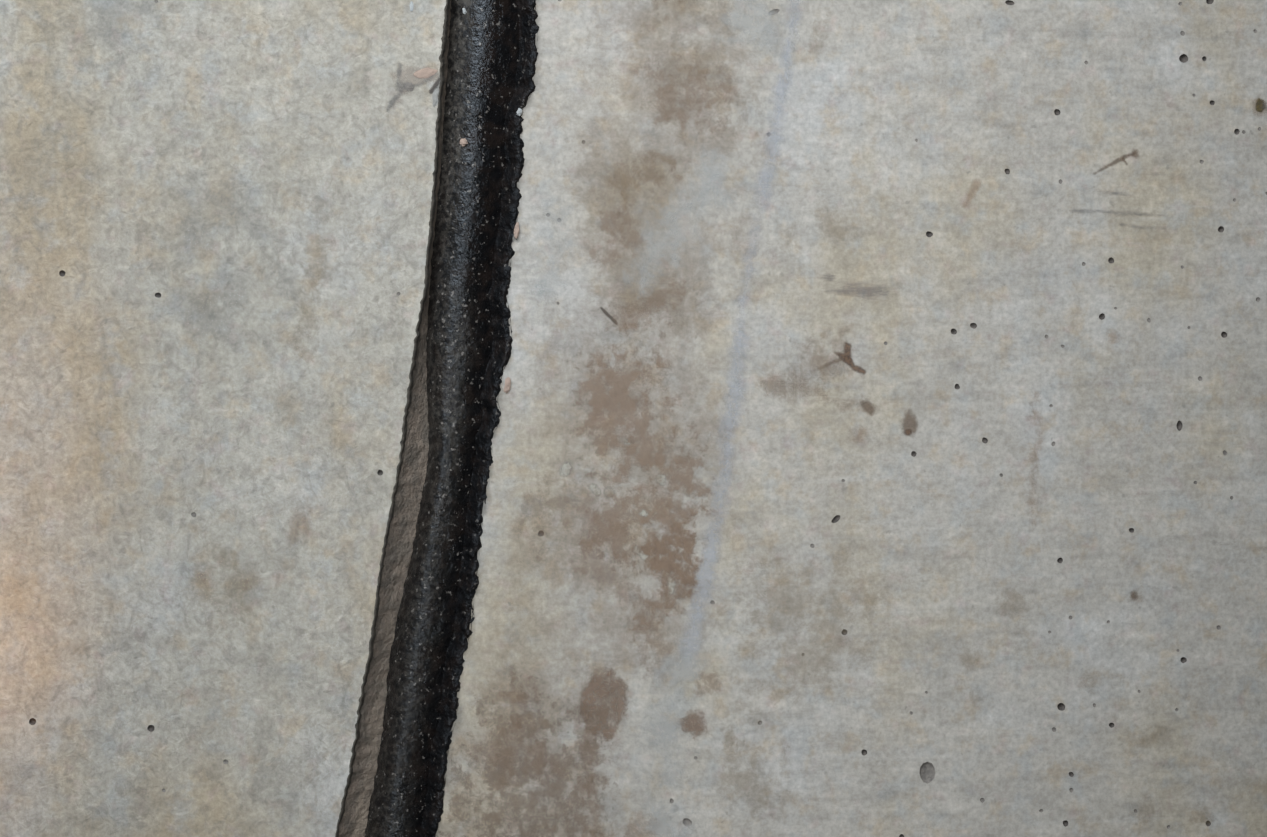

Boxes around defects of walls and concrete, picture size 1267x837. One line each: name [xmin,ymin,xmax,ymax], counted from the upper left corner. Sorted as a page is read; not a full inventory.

crack [335,0,451,837]
leakage [581,670,626,741]
leakage [681,714,704,734]